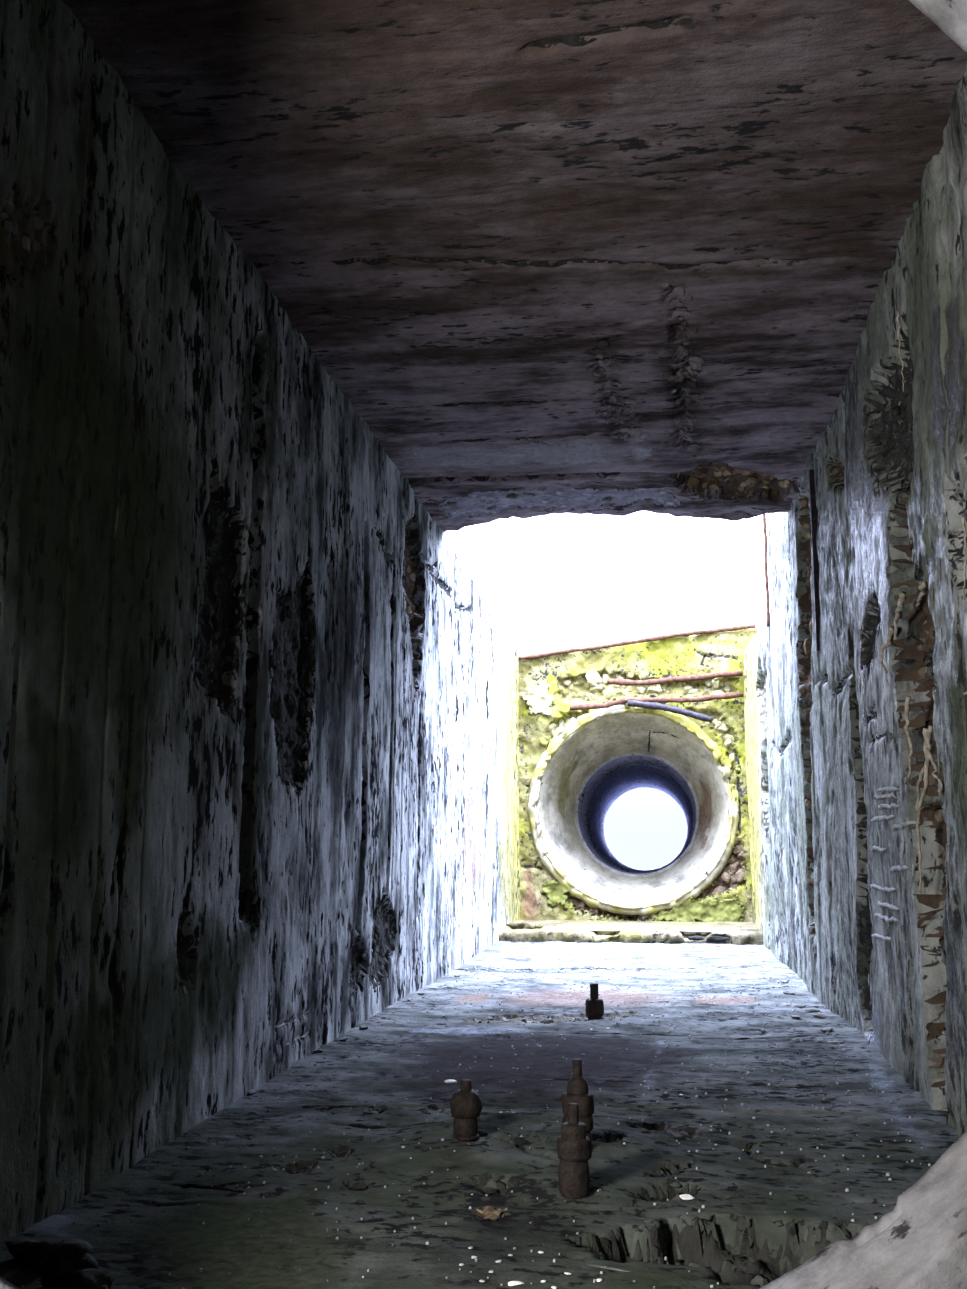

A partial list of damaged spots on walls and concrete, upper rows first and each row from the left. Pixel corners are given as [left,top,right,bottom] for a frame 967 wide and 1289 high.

spalling [945,473,967,612]
damp [871,787,920,831]
damp [870,865,909,941]
spalling [632,1162,701,1201]
spalling [575,1214,858,1287]